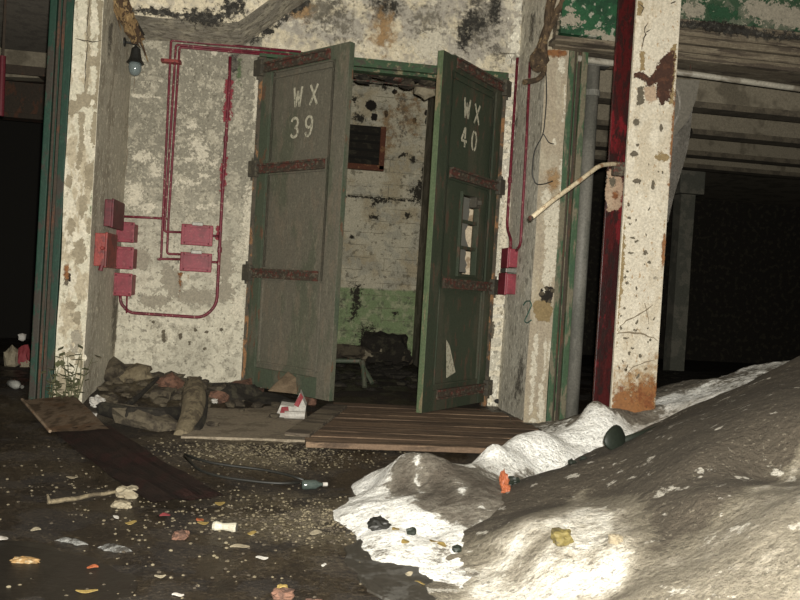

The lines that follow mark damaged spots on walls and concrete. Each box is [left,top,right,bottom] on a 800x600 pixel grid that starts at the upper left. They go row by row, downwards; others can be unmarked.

damp [127,0,249,29]
damp [456,0,504,67]
peeling [559,6,615,41]
peeling [681,0,800,30]
peeling [636,85,645,105]
rust [634,44,677,173]
peeling [648,151,670,190]
rust [611,365,657,413]